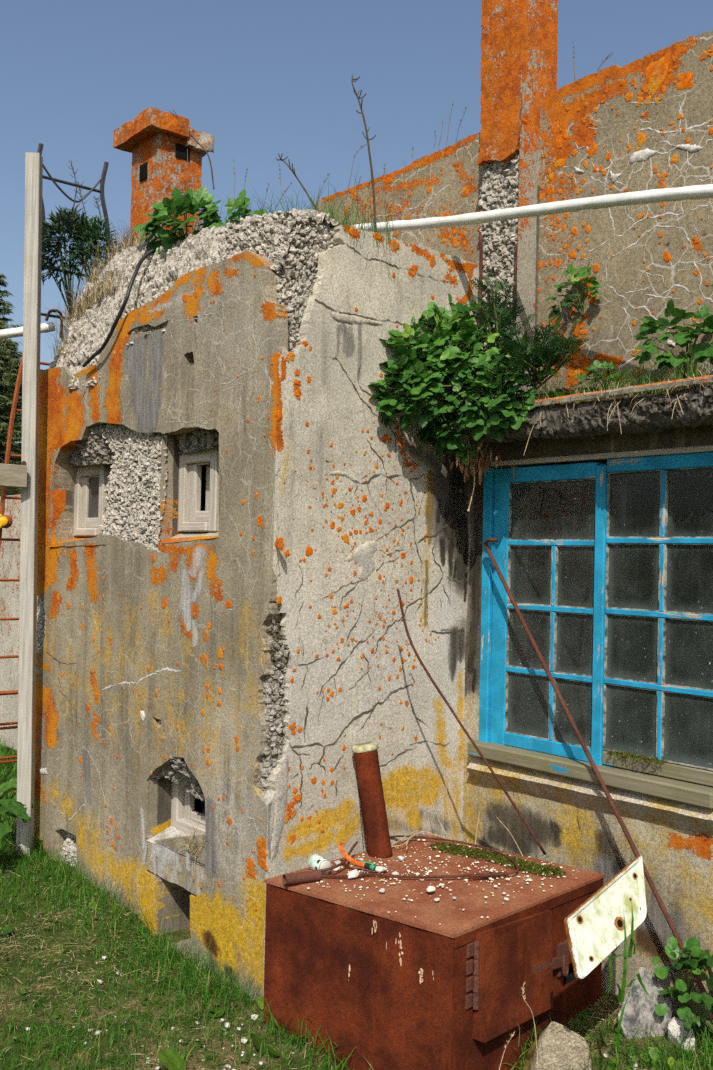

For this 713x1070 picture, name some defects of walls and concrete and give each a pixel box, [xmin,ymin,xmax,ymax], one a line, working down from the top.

spalling [223,212,339,352]
spalling [477,147,520,350]
crack [534,102,713,370]
spalling [66,423,219,552]
crack [163,295,463,808]
water stain [426,471,483,692]
spalling [256,610,288,795]
water stain [141,808,190,874]
water stain [205,798,216,876]